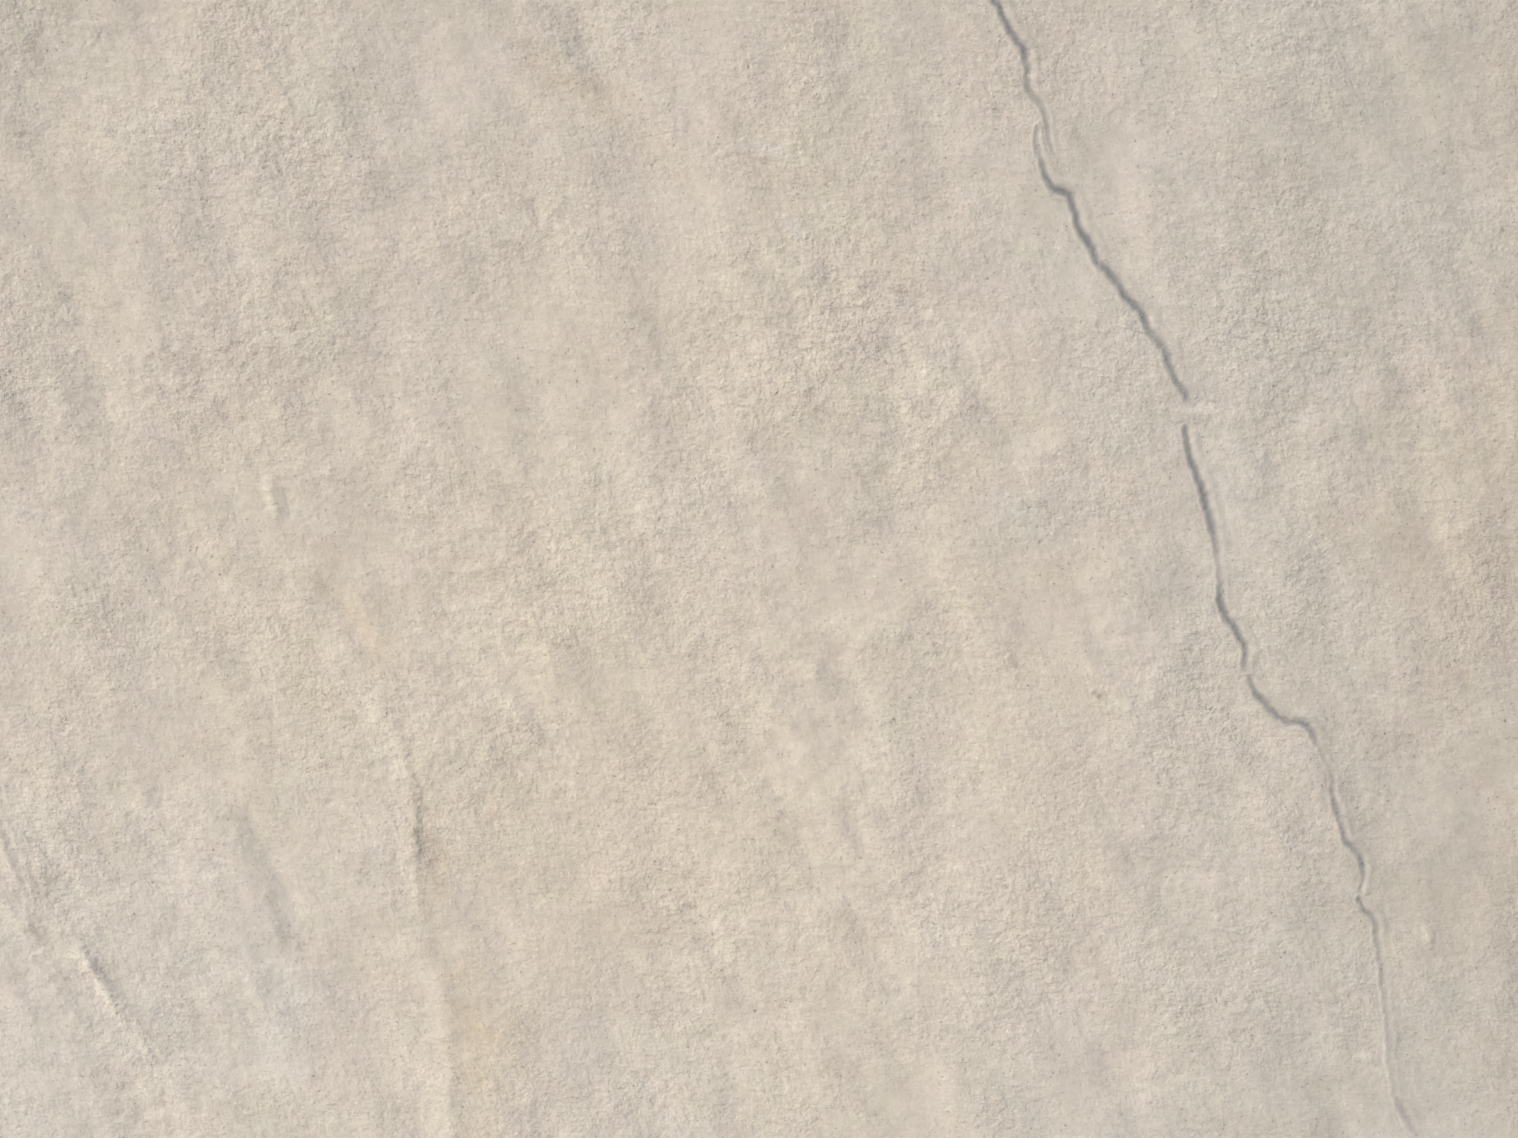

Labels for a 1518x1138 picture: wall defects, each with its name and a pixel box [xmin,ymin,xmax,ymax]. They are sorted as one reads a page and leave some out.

crack [981,0,1435,1138]